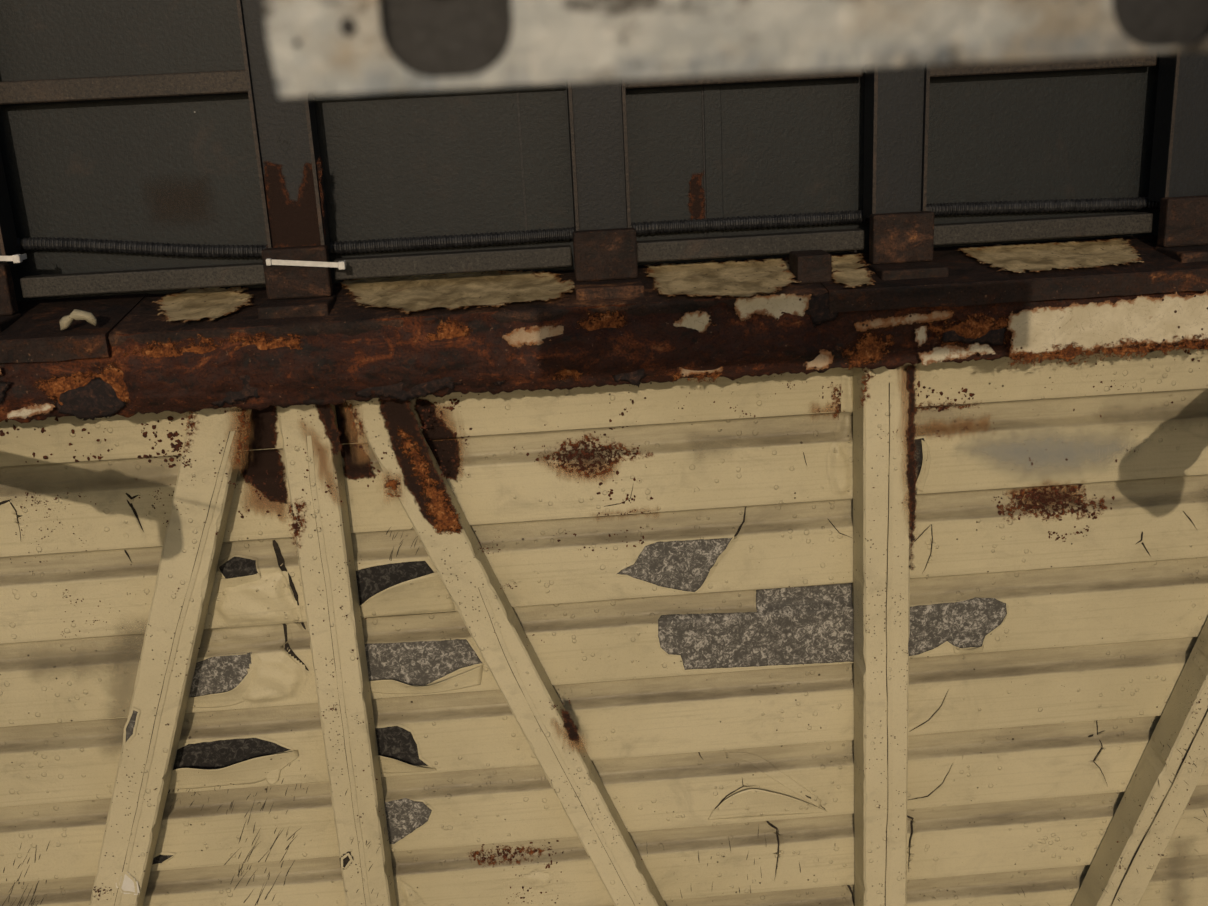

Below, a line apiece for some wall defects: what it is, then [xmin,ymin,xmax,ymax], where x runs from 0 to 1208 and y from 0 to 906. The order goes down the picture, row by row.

corrosion [1009,334,1208,390]
corrosion [137,396,472,548]
corrosion [513,385,653,551]
peeling [355,558,456,619]
peeling [614,536,734,594]
corrosion [991,484,1115,542]
crack [1136,532,1151,557]
peeling [655,582,854,672]
peeling [908,594,1009,658]
peeling [169,736,299,789]
crack [1088,720,1107,786]
crack [1111,709,1208,906]